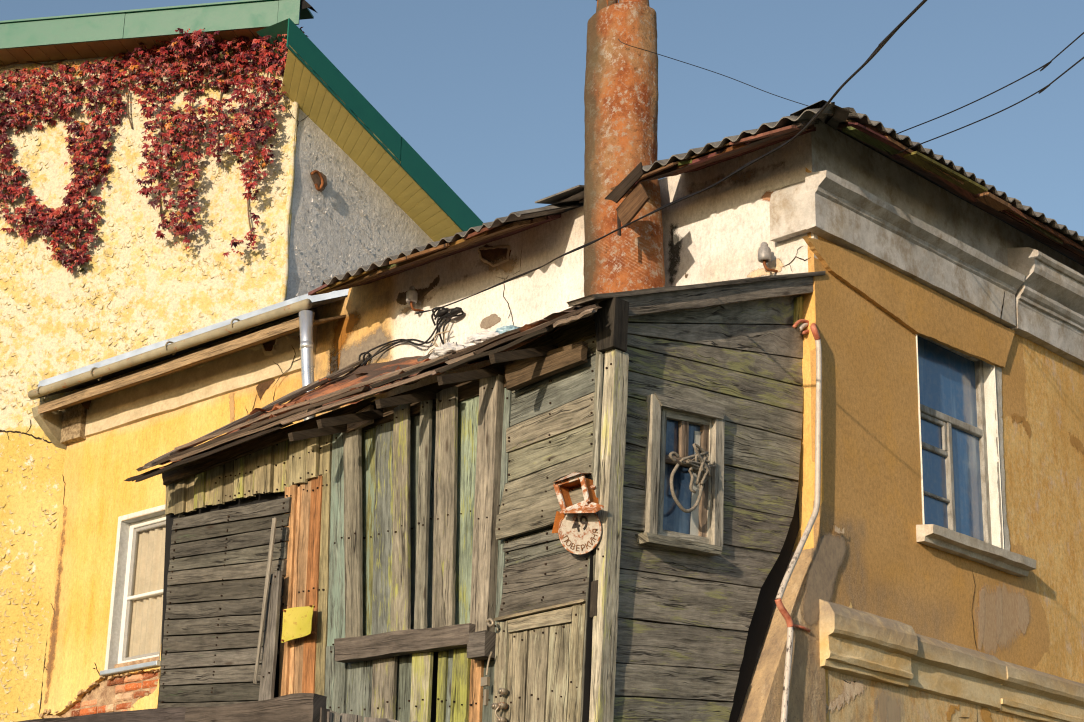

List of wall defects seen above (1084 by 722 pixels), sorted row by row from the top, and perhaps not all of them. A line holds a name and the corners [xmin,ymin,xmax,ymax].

water stain [668,224,682,285]
peeling [0,87,410,497]
flaking render [396,275,440,306]
rust [329,312,360,374]
water stain [327,327,390,379]
crack [0,420,52,443]
peeling [0,485,57,722]
peeling [978,585,1029,653]
flaking render [39,656,160,718]